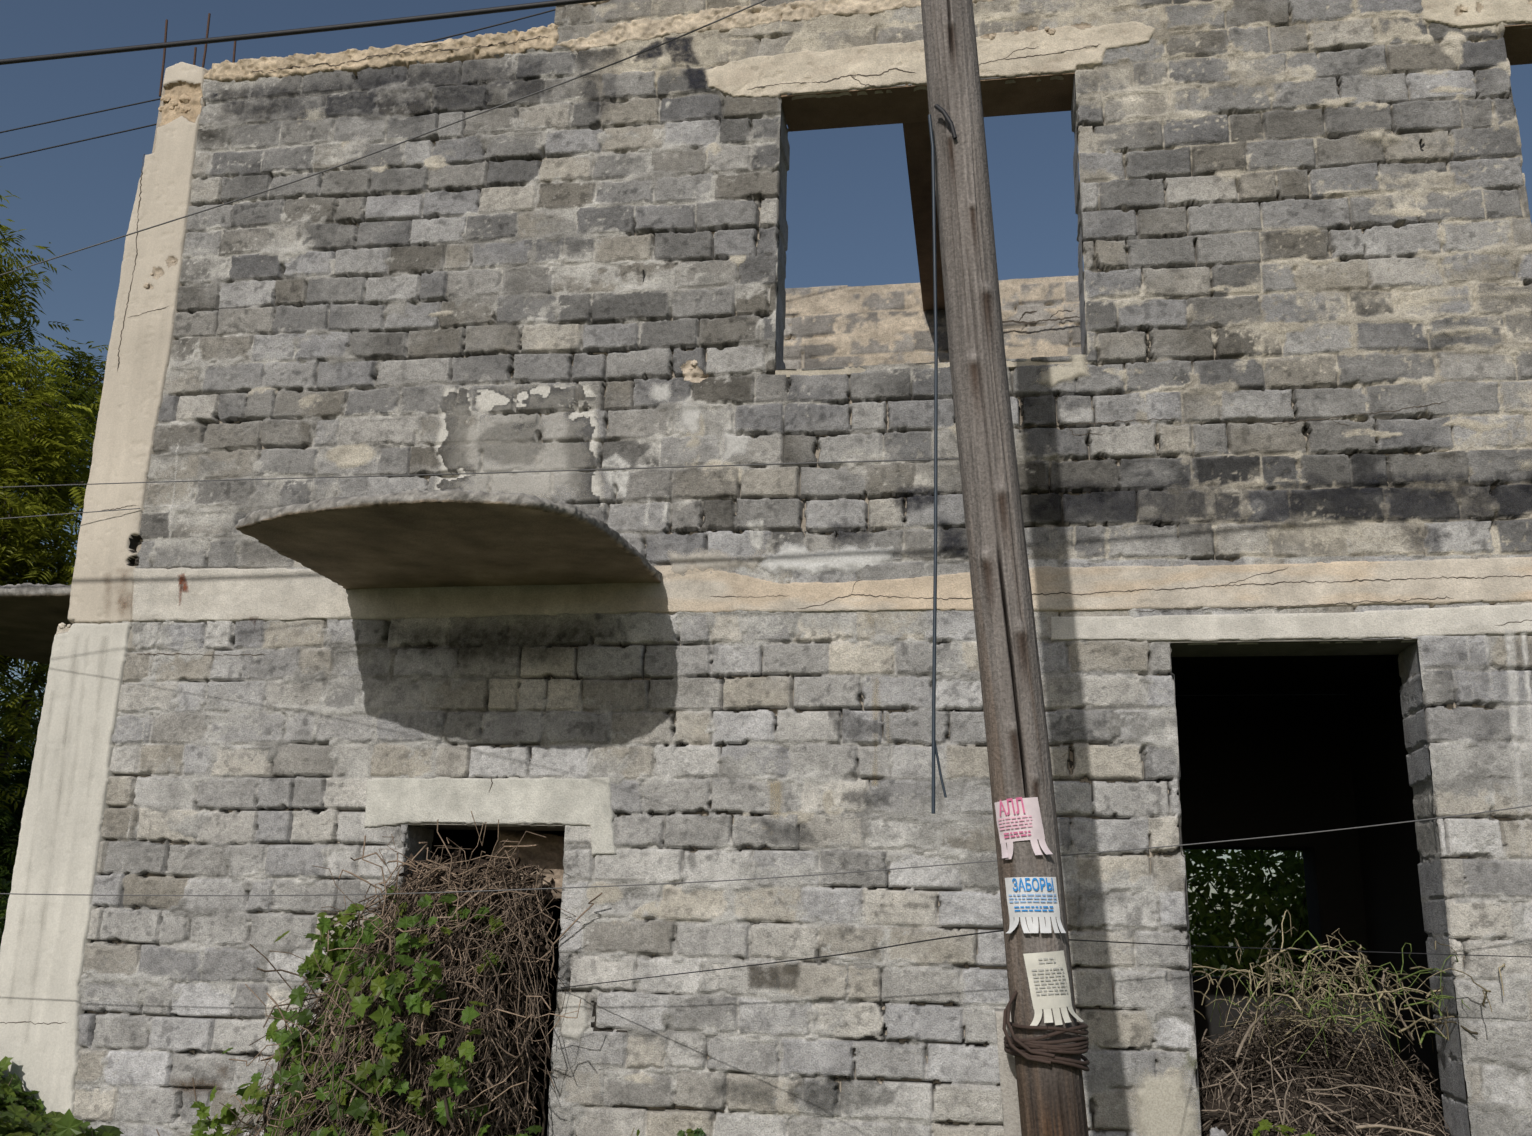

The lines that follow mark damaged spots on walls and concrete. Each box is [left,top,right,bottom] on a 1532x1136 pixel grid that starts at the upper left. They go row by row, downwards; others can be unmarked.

spalling [157,13,211,128]
leakage [650,384,701,433]
leakage [435,384,629,506]
leakage [723,430,750,460]
leakage [748,521,763,549]
crack [710,579,971,609]
crack [1032,568,1532,612]